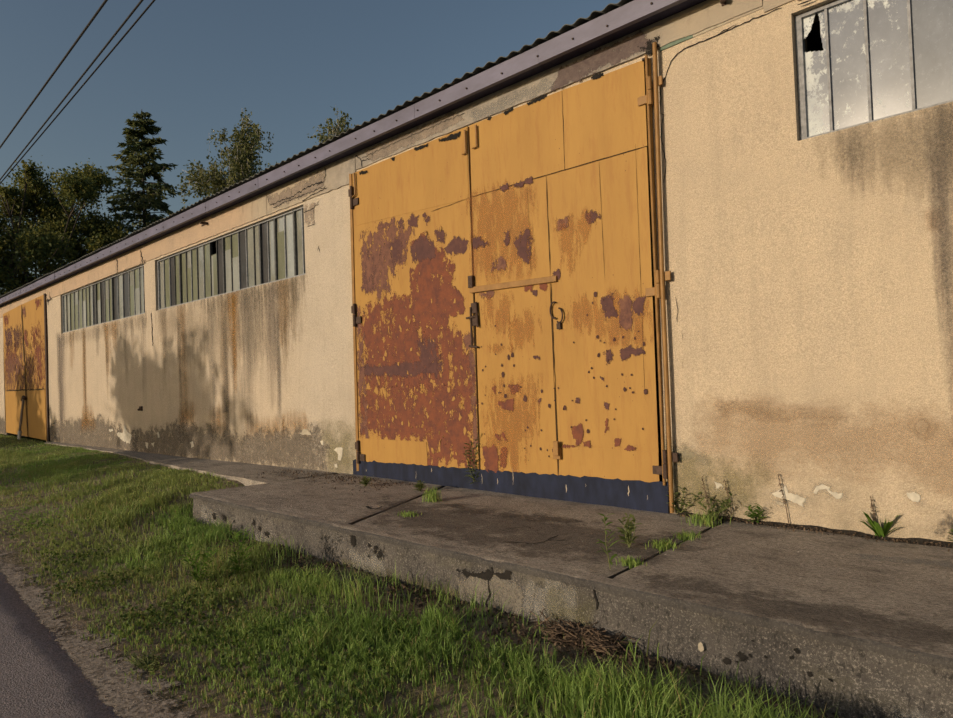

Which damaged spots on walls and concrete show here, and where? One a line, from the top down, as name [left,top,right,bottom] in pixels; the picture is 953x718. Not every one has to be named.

crack [660,8,781,183]
rust [583,210,601,224]
rust [2,299,46,390]
rust [356,212,580,473]
rust [586,292,646,365]
flaking render [50,414,343,470]
rust [524,419,592,457]
rust [604,402,636,451]
flaking render [772,484,843,507]
spalling [456,567,523,616]